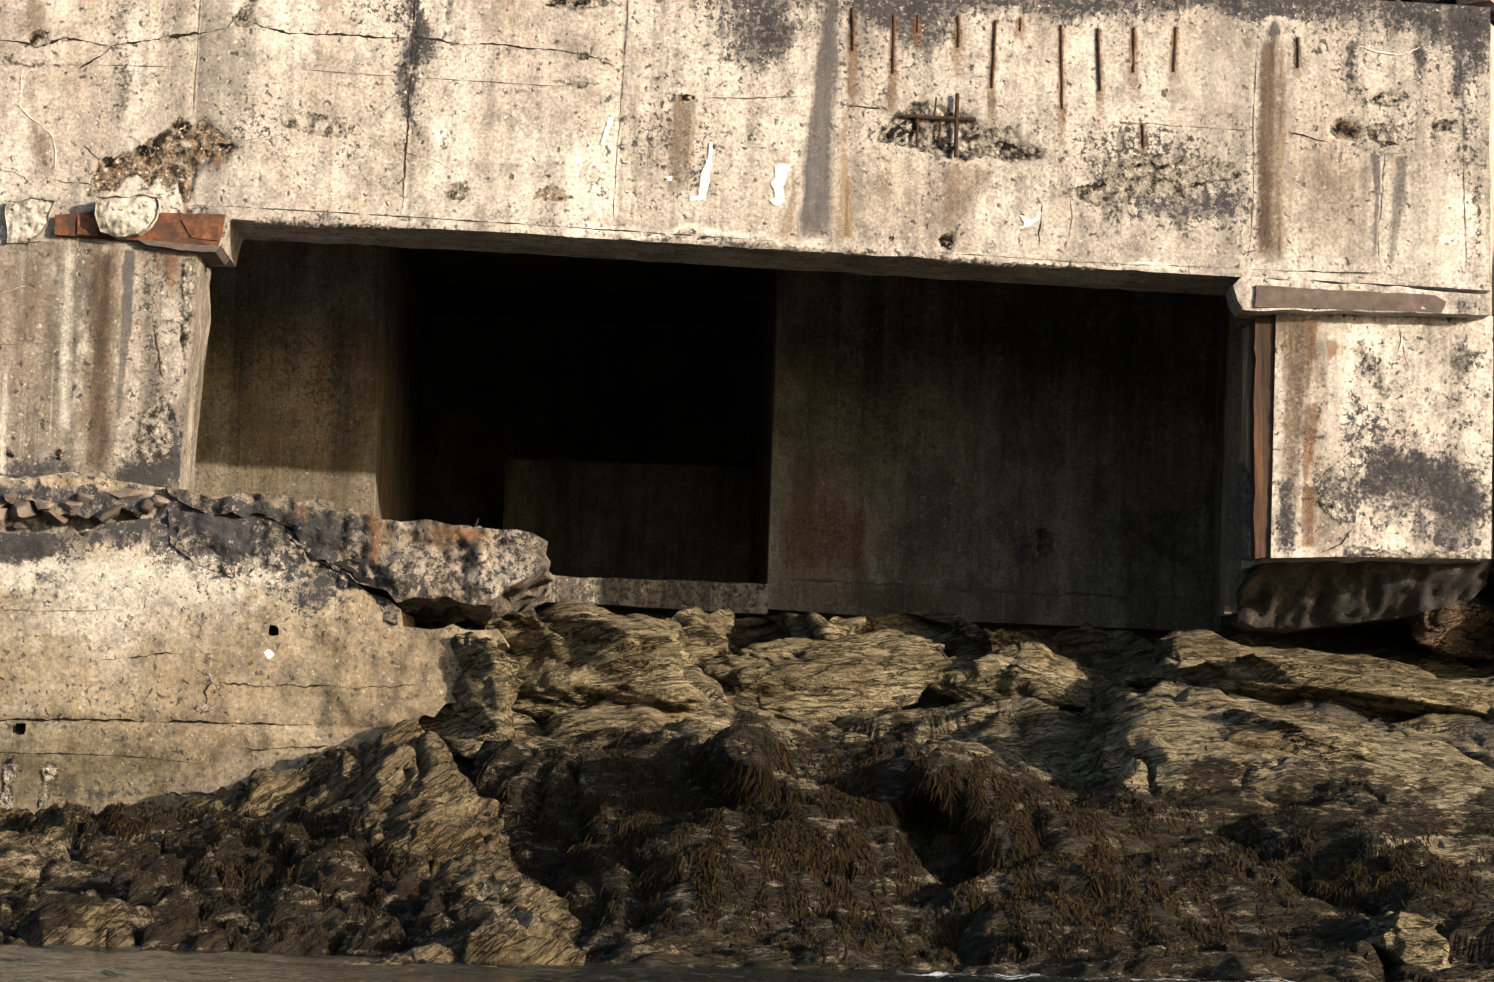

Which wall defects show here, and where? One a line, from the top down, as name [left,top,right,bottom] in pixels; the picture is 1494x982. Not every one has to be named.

crack [0,1,616,68]
rust [989,20,997,108]
rust [1058,25,1067,128]
rust [1095,28,1104,106]
rust [1129,27,1138,73]
rust [1170,27,1179,72]
damp [770,0,838,232]
spalling [876,93,1046,164]
crack [1,145,99,186]
spalling [87,117,239,212]
crack [152,318,164,380]
damp [0,538,58,584]